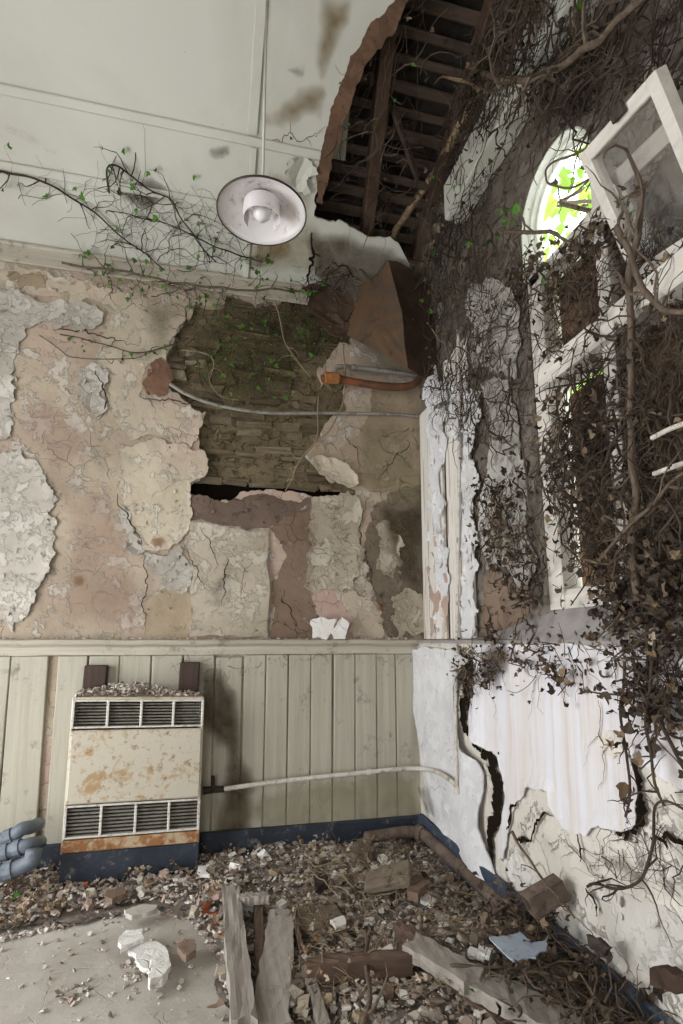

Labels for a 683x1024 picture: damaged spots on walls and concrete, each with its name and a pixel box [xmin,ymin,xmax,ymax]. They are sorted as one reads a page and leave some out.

leakage [323,11,342,52]
spalling [285,0,408,204]
crack [117,494,148,630]
peeling [0,267,683,871]
crack [459,661,611,916]
crack [616,762,683,850]
peeling [617,956,628,973]